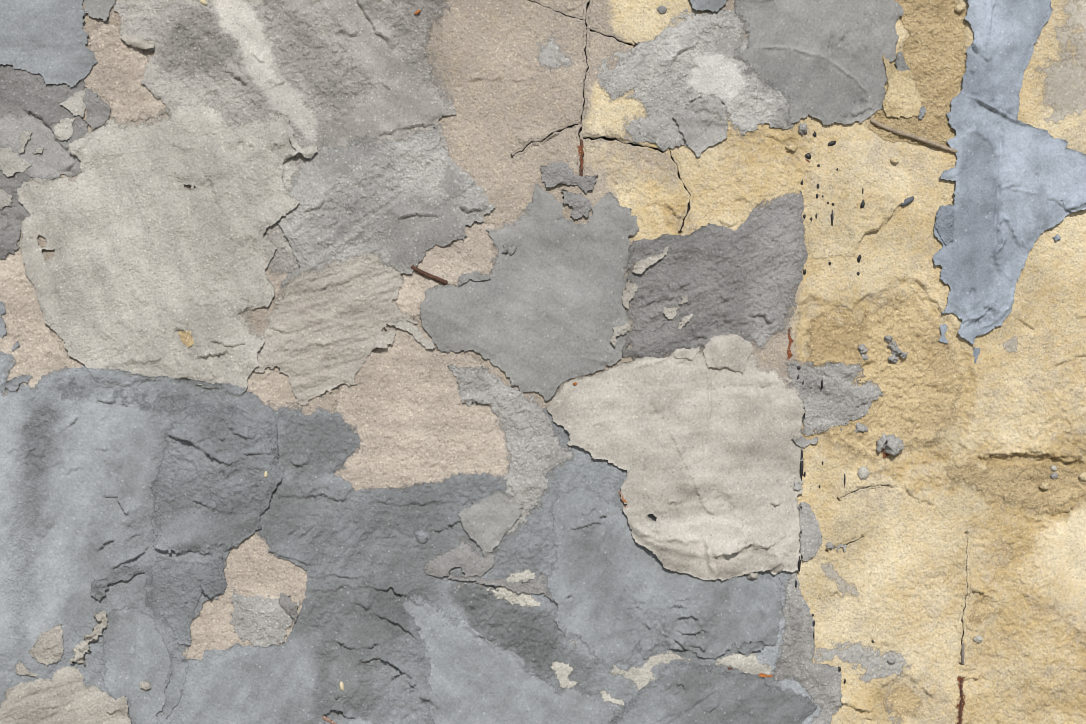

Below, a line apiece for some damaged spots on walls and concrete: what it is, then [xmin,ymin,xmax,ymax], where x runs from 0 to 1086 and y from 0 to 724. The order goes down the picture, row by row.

peeling [54,24,166,141]
crack [512,0,693,231]
spalling [868,0,967,148]
peeling [0,240,84,390]
peeling [331,222,512,491]
peeling [674,334,753,374]
spalling [791,293,969,463]
peeling [182,530,308,661]
peeling [480,569,541,607]
peeling [551,661,578,689]
peeling [610,651,690,690]
peeling [715,653,772,675]